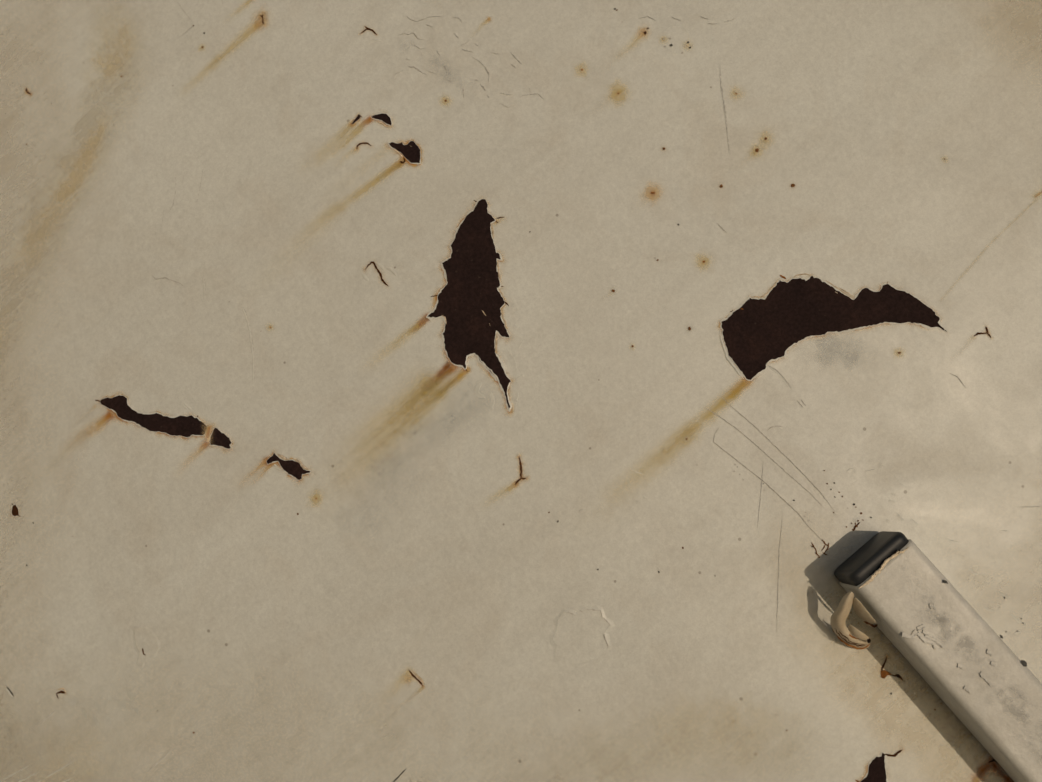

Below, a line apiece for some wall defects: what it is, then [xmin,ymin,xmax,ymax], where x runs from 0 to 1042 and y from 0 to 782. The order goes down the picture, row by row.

peeling [350,112,394,127]
rust [359,158,405,194]
peeling [387,139,423,167]
peeling [426,196,515,414]
peeling [717,272,947,383]
peeling [95,392,233,452]
rust [402,362,470,413]
rust [681,378,751,440]
peeling [264,451,313,482]
peeling [856,750,902,782]